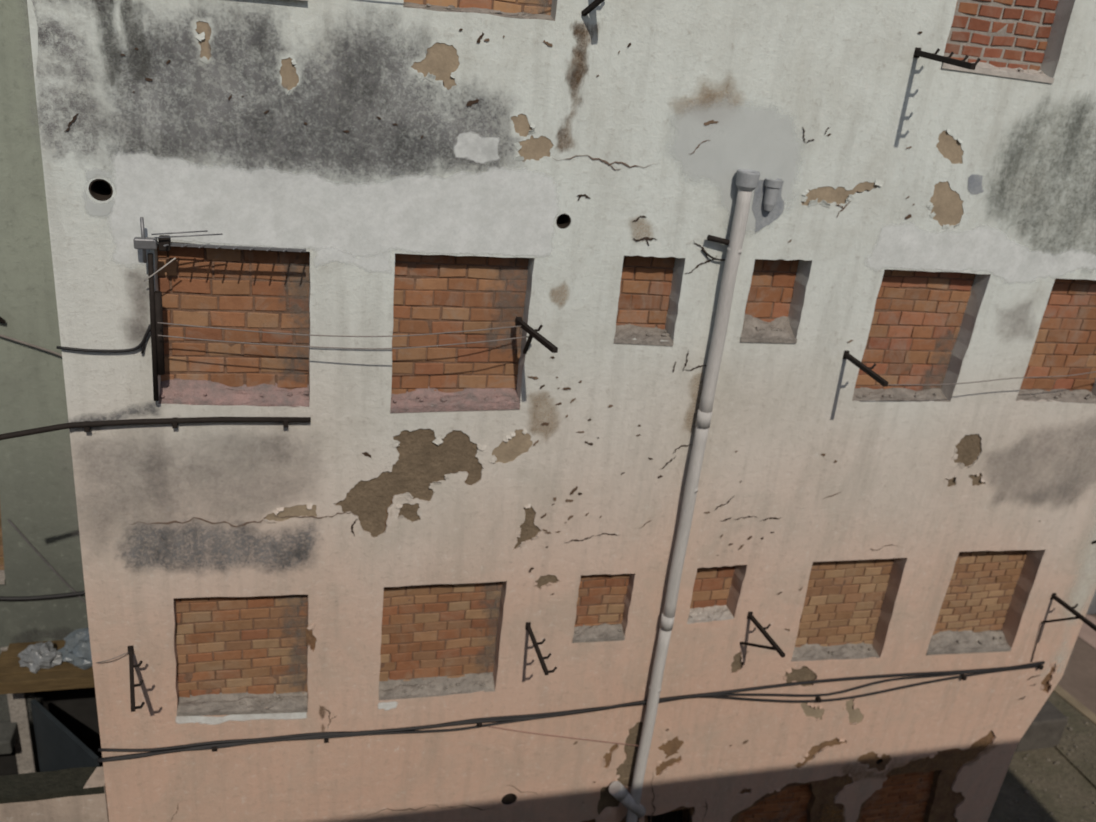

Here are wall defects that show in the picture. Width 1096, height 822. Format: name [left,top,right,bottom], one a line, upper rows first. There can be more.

damp [38,0,513,178]
flaking render [411,42,460,90]
crack [553,155,650,170]
flaking render [801,179,884,208]
flaking render [905,181,963,229]
flaking render [936,128,963,164]
mould [992,106,1096,256]
flaking render [335,428,539,537]
mould [123,523,314,569]
crack [134,512,358,536]
flaking render [588,722,643,822]
spalling [730,730,995,822]